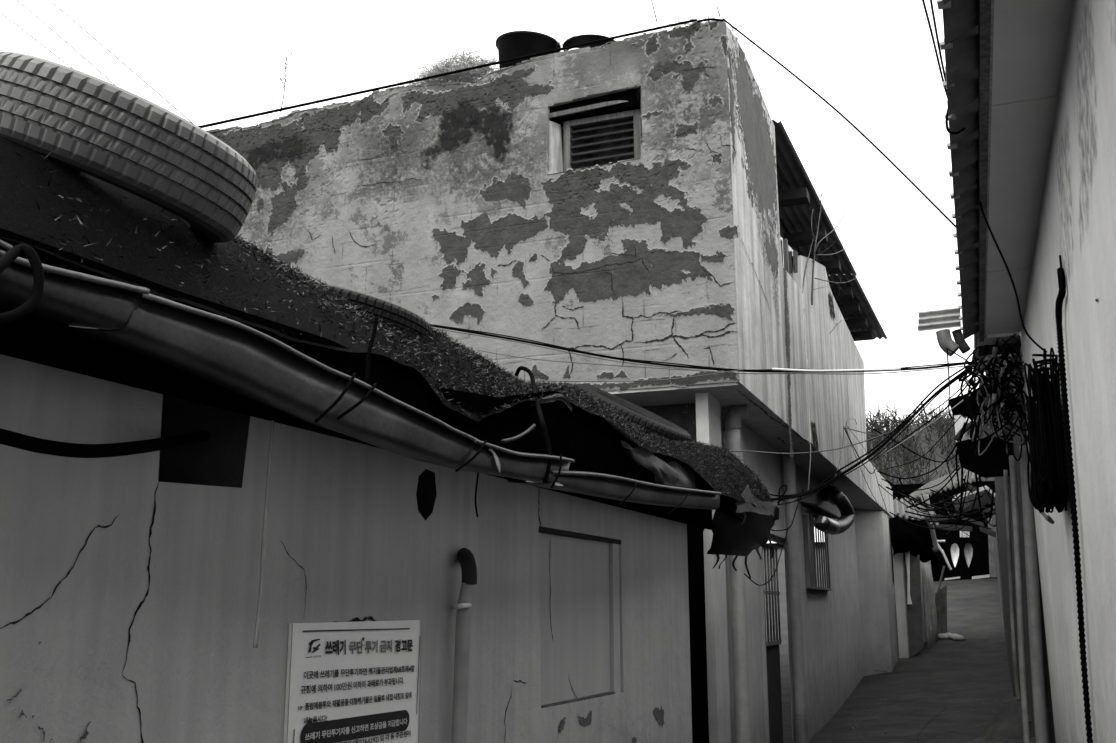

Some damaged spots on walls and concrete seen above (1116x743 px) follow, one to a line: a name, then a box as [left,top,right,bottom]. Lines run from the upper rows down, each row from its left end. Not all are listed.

peeling [212,64,556,268]
peeling [430,157,740,326]
crack [497,246,736,377]
peeling [641,21,780,278]
crack [702,239,770,318]
crack [739,391,816,450]
crack [0,515,119,629]
crack [122,481,160,743]